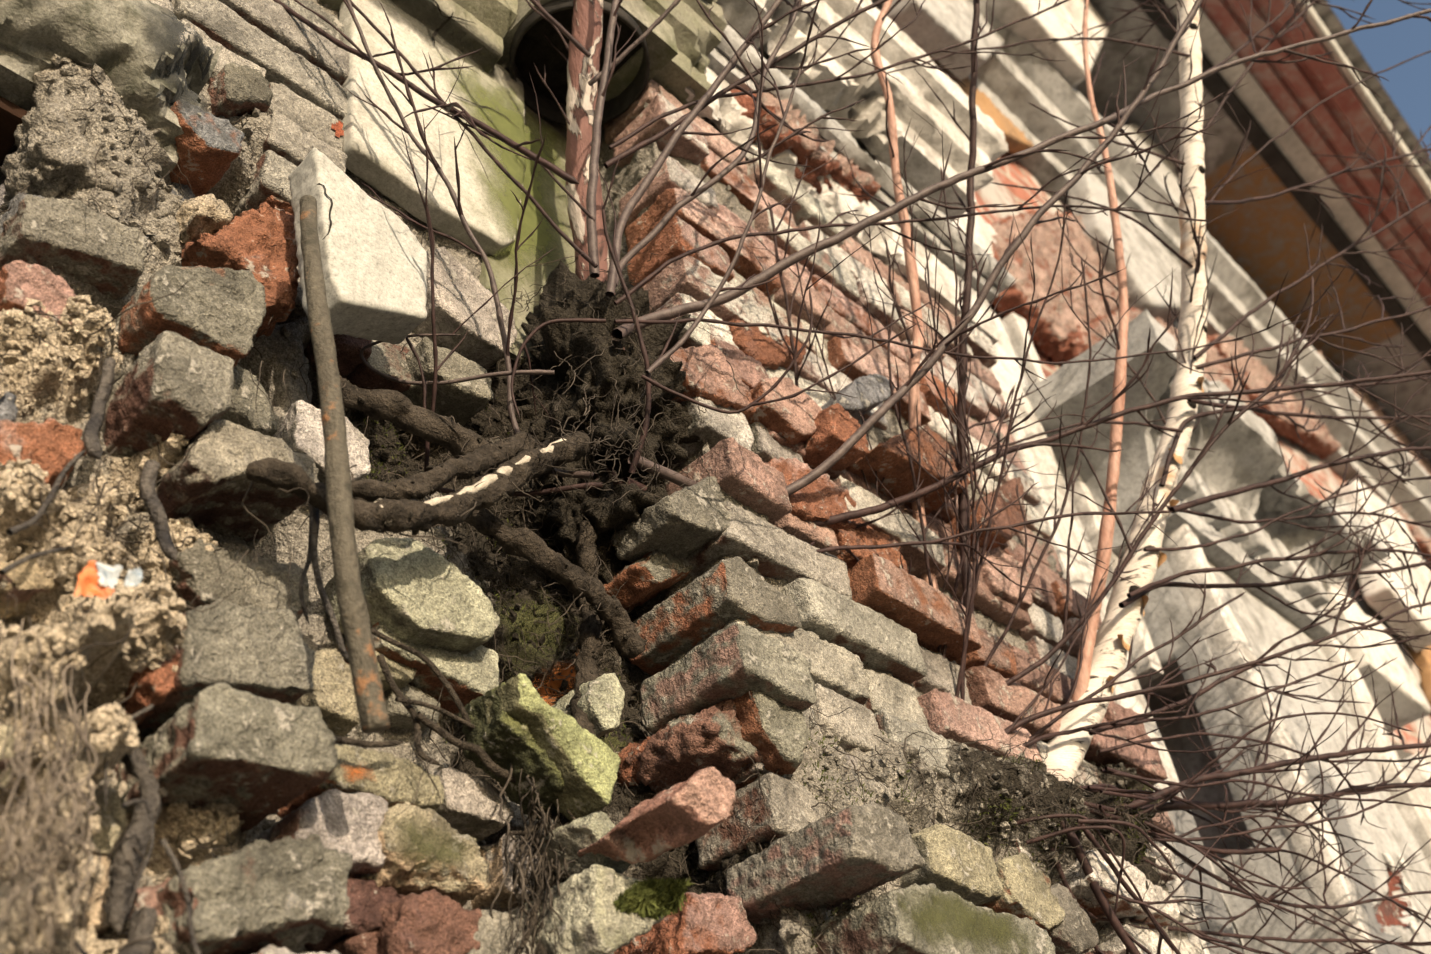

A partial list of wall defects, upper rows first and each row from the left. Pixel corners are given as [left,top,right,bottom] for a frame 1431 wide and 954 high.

spalling [331,120,344,138]